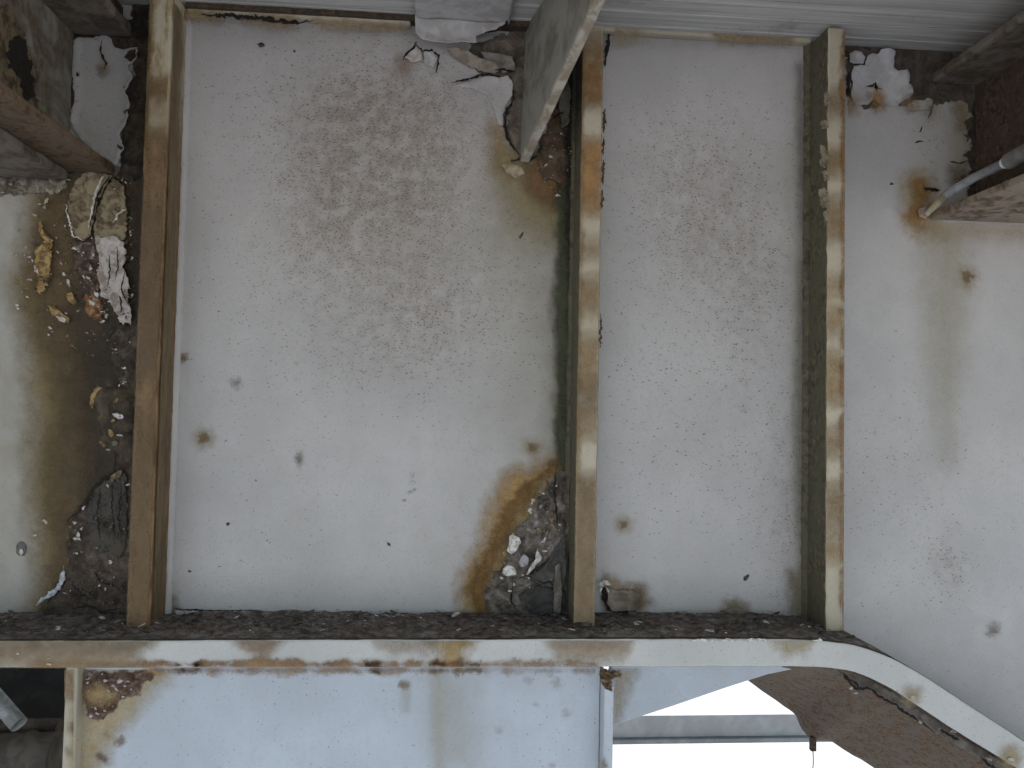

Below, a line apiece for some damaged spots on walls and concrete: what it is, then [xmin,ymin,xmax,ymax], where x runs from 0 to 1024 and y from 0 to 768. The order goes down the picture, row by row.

peeling [0,4,150,356]
spalling [403,0,539,172]
corrosion [461,39,644,623]
water stain [553,72,573,471]
peeling [846,46,976,197]
corrosion [903,177,940,233]
corrosion [0,641,629,768]
crack [839,671,1013,768]